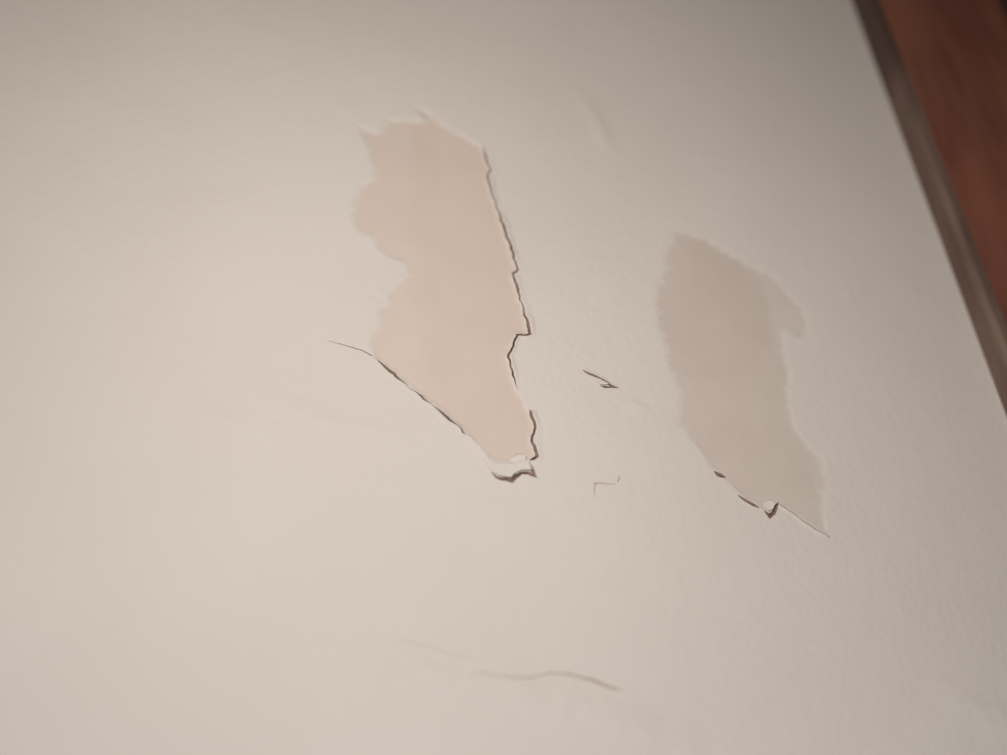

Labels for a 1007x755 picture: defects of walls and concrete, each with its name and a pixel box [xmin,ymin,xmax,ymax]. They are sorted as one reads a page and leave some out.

peeling [331,102,544,483]
peeling [652,227,831,541]